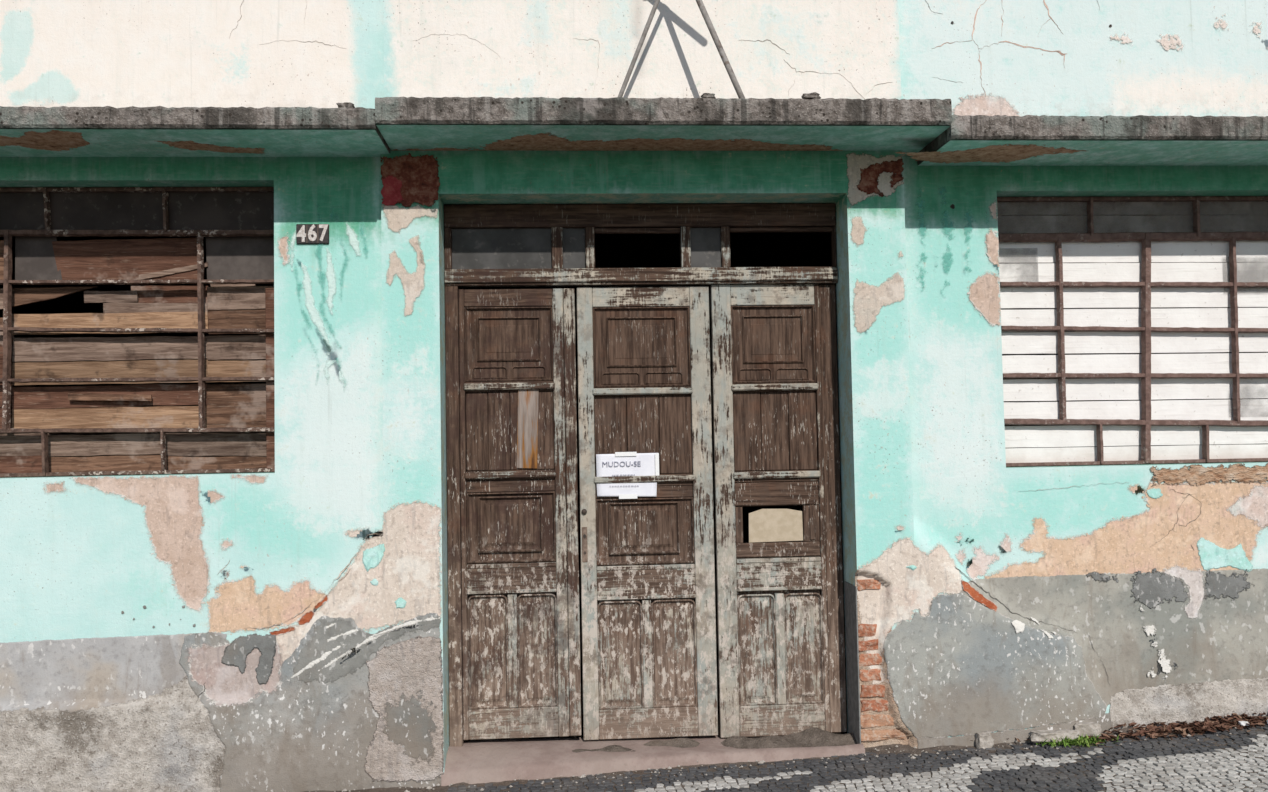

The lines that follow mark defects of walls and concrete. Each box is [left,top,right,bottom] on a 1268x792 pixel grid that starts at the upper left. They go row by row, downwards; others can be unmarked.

crack [925,0,1067,97]
corrosion [0,130,90,151]
corrosion [157,141,265,154]
corrosion [380,132,843,207]
peeling [846,153,903,245]
damp [291,225,366,381]
peeling [382,205,438,316]
peeling [853,272,905,333]
peeling [967,197,1001,326]
spalling [42,474,442,707]
peeling [855,463,1268,748]
spalling [364,636,444,784]